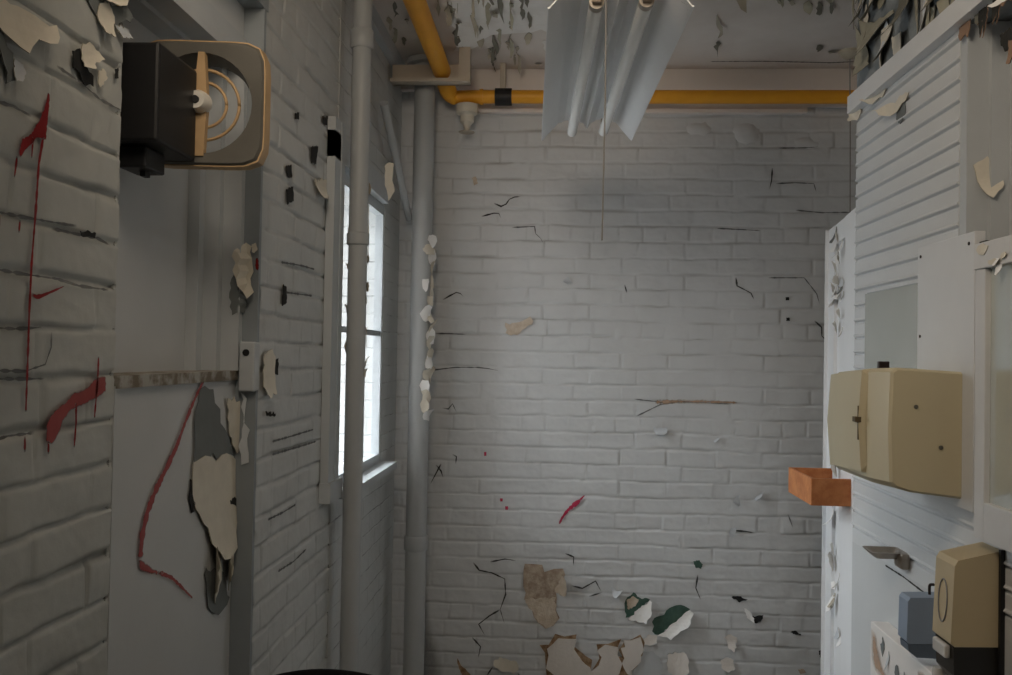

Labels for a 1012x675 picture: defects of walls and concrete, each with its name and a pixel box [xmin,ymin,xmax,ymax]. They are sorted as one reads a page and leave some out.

peeling [0,0,60,84]
peeling [72,42,119,87]
peeling [88,0,133,39]
peeling [436,0,555,74]
peeling [848,0,955,77]
peeling [958,0,1012,64]
peeling [229,243,258,315]
peeling [419,235,437,421]
crack [637,399,726,416]
peeling [188,386,250,615]
crack [473,559,514,675]
spalling [523,564,693,675]